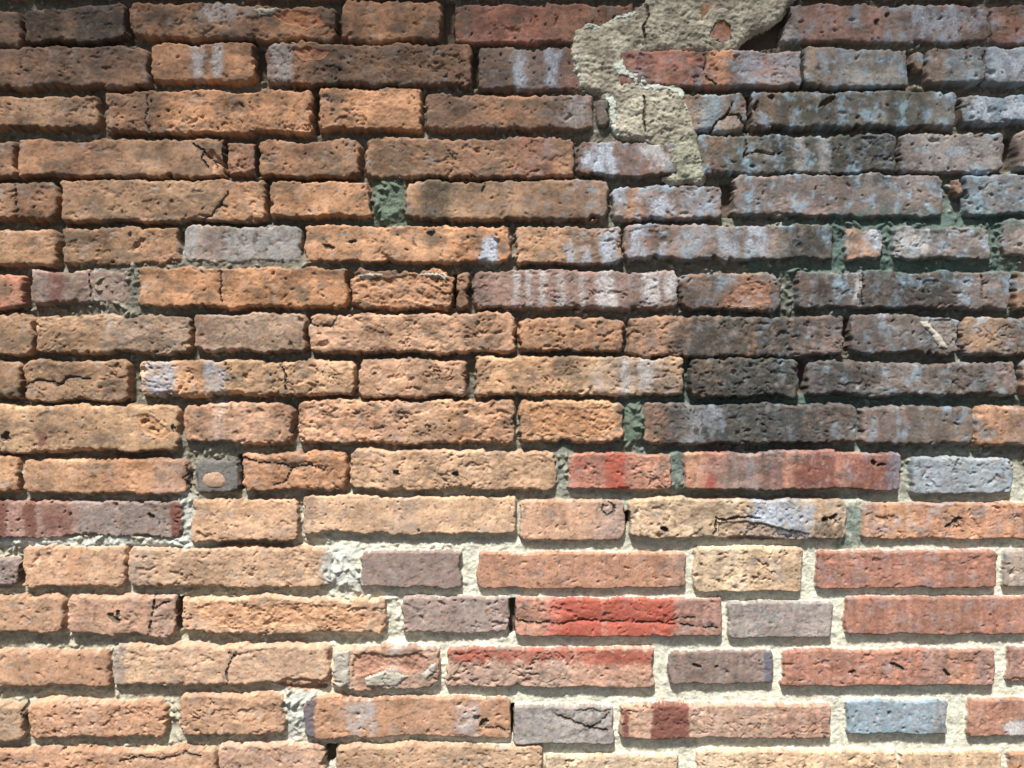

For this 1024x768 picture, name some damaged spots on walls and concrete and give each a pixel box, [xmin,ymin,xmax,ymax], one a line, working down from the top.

peeling [570,0,802,187]
damp [971,95,1024,128]
damp [581,143,617,178]
damp [639,145,669,169]
crack [202,191,229,224]
damp [868,230,882,250]
damp [565,224,646,308]
damp [641,272,678,305]
crack [244,456,328,486]
crack [712,516,761,535]
crack [147,593,170,635]
crack [555,712,610,732]